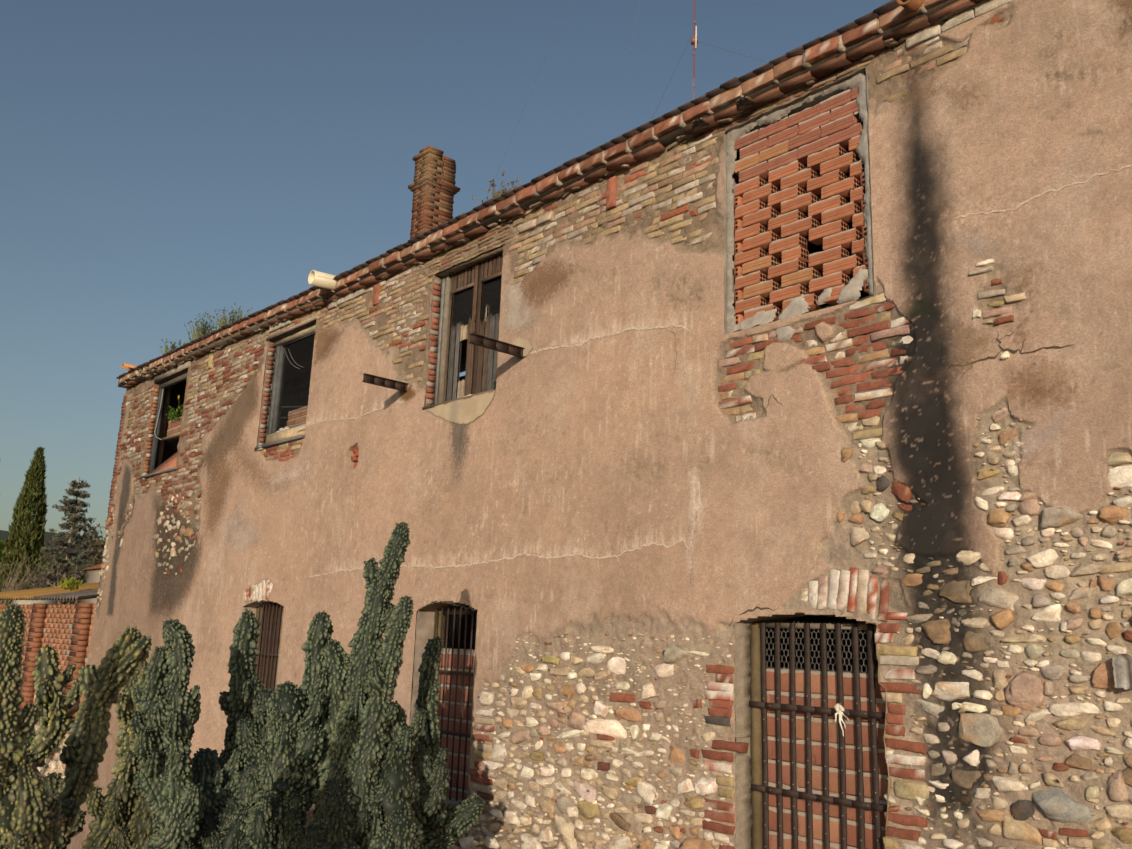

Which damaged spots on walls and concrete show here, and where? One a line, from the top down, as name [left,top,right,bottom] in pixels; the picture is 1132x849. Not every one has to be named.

crack [949,164,1132,219]
peeling [95,3,1014,618]
peeling [968,259,1026,330]
crack [951,332,1075,378]
crack [308,511,697,611]
peeling [710,278,1132,849]
peeling [449,609,749,849]